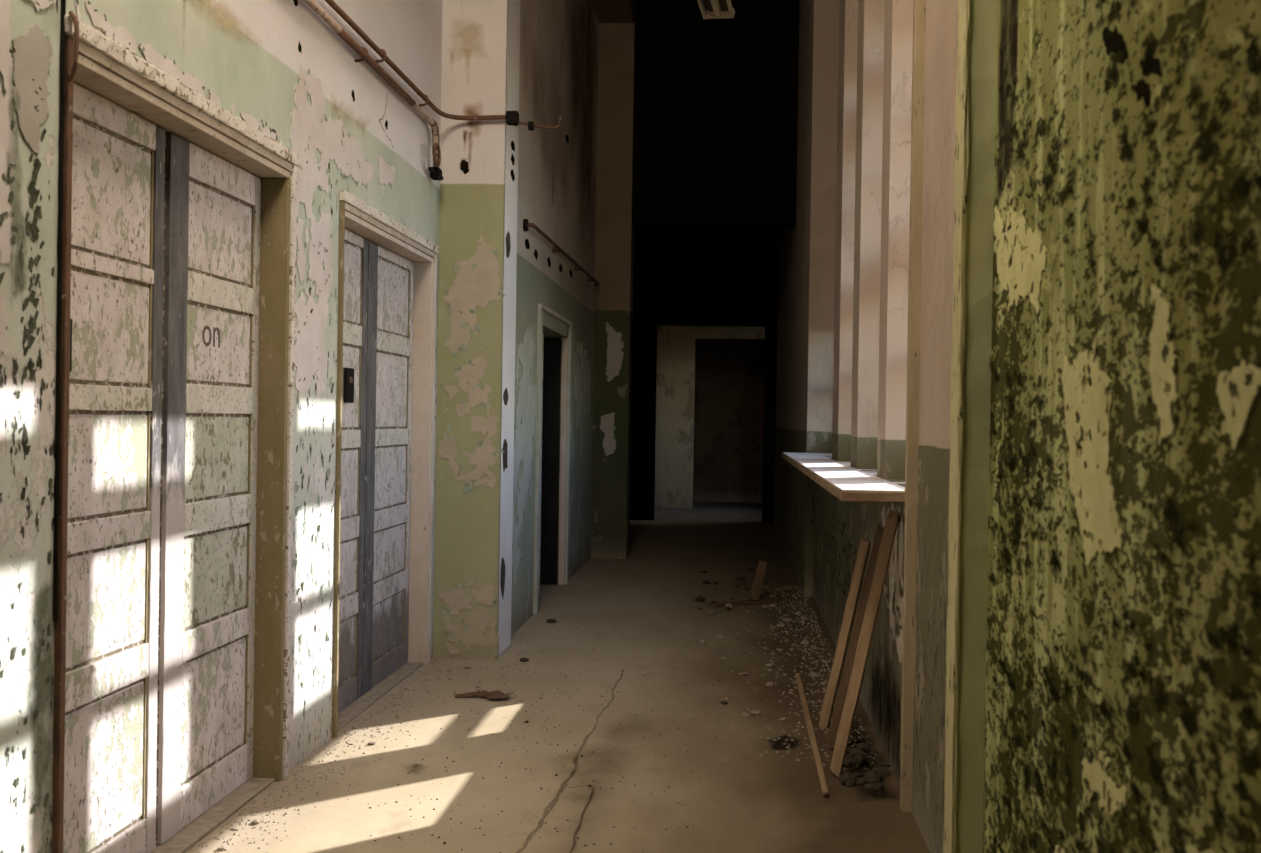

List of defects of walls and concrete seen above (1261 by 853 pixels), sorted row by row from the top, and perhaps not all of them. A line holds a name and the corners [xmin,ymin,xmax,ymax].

flaking render [1101,26,1162,109]
peeling [0,0,56,399]
peeling [74,0,396,403]
peeling [993,203,1047,314]
peeling [438,231,572,598]
peeling [600,412,616,461]
peeling [605,322,624,382]
peeling [1061,333,1123,566]
peeling [1147,284,1180,445]
peeling [1215,352,1261,454]
crack [516,668,625,853]
peeling [1080,749,1128,816]